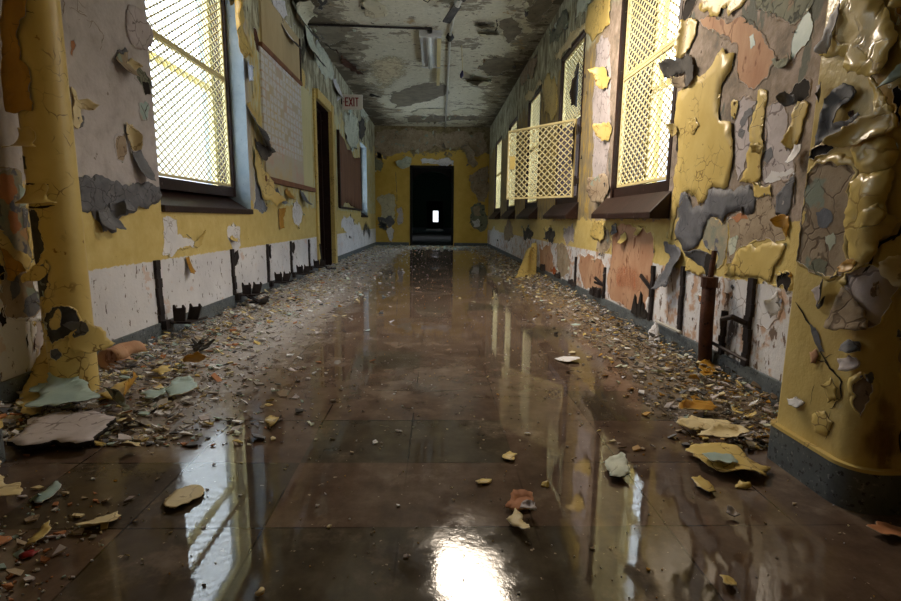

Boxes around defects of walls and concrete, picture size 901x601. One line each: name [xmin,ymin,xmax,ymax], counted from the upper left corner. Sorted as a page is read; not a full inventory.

peeling [0,0,33,114]
peeling [272,0,389,101]
peeling [71,87,102,129]
peeling [79,4,162,233]
peeling [344,109,368,153]
peeling [369,81,479,125]
peeling [395,156,454,169]
peeling [161,215,206,274]
peeling [341,214,363,243]
peeling [375,190,405,242]
peeling [461,0,901,417]